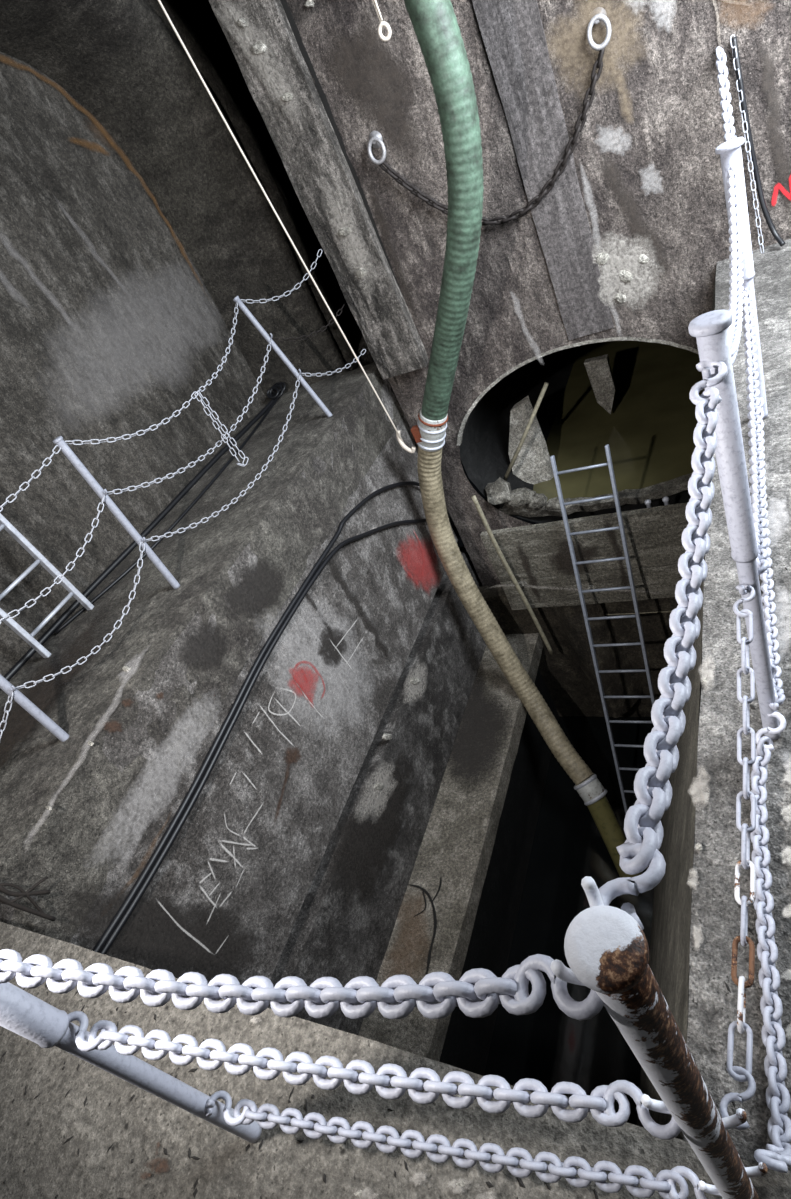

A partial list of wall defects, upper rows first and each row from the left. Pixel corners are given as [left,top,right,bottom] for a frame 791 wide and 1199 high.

corrosion [552,0,634,119]